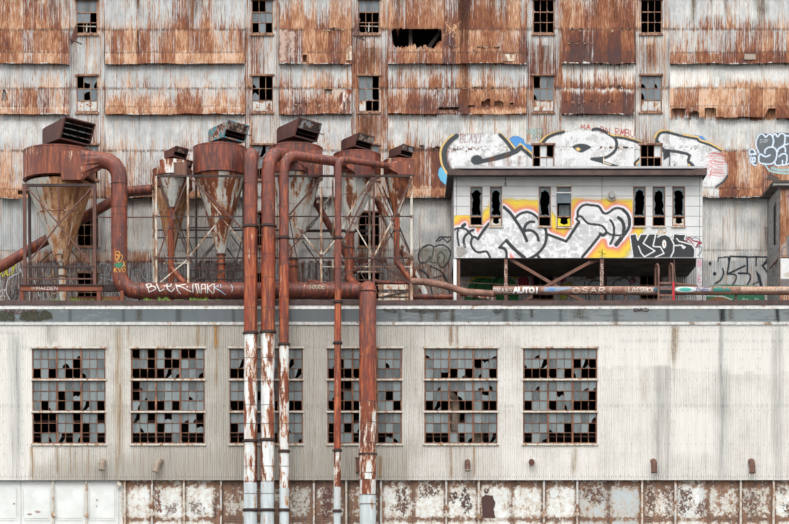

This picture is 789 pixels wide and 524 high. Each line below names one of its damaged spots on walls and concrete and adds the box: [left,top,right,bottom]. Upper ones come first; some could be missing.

corrosion [459,0,469,42]
peeling [155,490,178,517]
peeling [292,489,311,517]
peeling [322,487,333,520]
peeling [391,485,439,517]
peeling [449,487,495,518]
peeling [580,485,605,505]
peeling [645,486,706,517]
peeling [743,491,761,517]